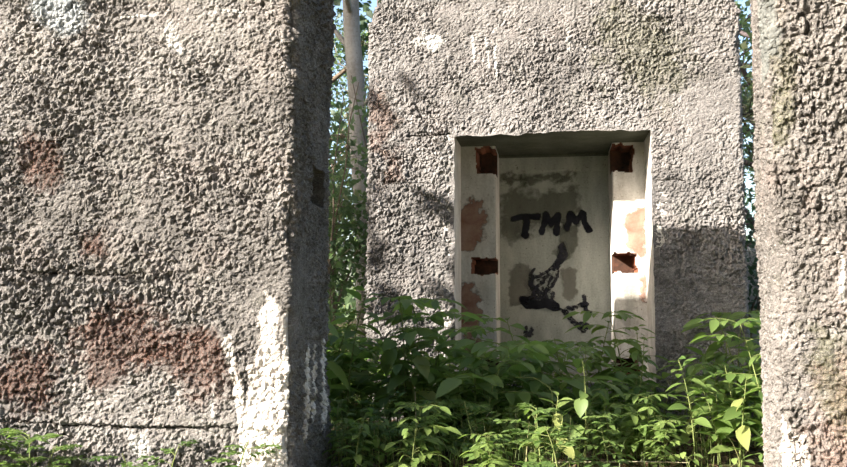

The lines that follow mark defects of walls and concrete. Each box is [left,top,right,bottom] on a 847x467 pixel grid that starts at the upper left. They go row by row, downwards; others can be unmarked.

flaking render [461,197,488,252]
flaking render [623,207,646,257]
flaking render [461,282,483,351]